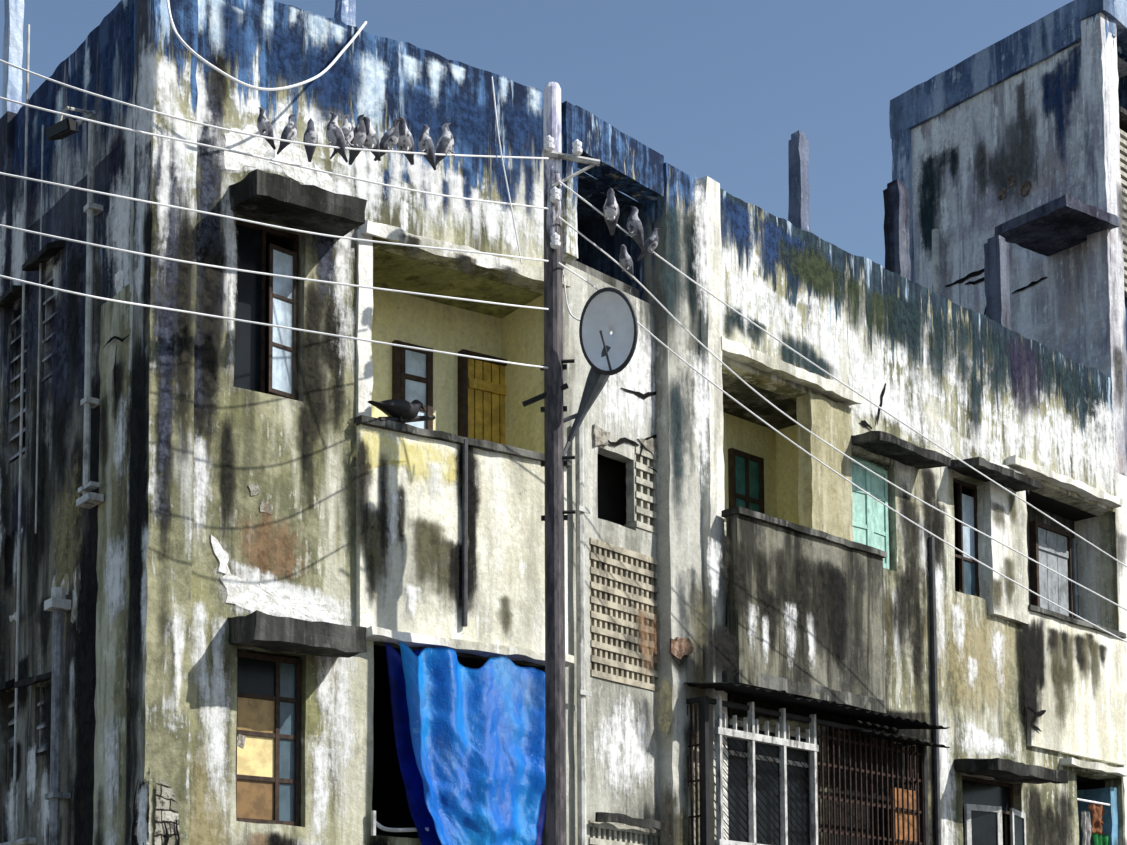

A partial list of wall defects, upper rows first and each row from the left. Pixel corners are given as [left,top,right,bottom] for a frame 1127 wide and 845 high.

water stain [913,46,1085,255]
water stain [1119,185,1127,250]
crack [945,268,986,315]
crack [1012,277,1047,294]
water stain [661,187,1123,502]
water stain [0,0,544,845]
rust [243,516,304,576]
flaking render [210,535,347,624]
water stain [594,681,672,788]
water stain [660,537,848,845]
flaking render [133,769,180,845]